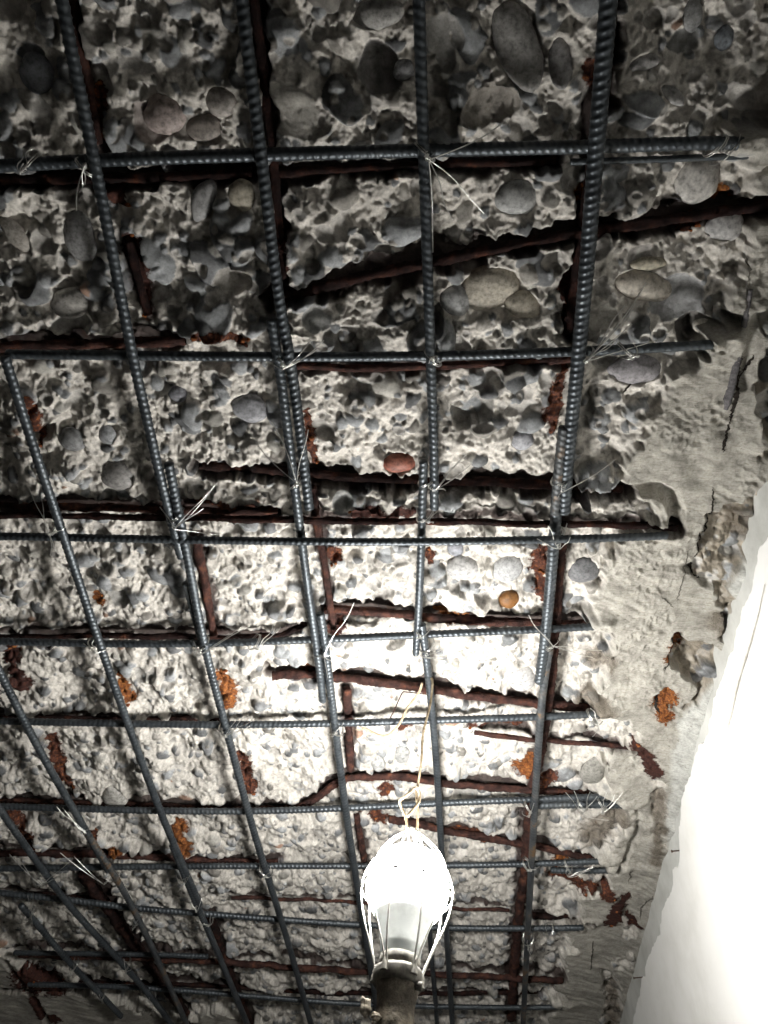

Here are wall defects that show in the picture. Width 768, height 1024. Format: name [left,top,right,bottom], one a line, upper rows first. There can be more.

spalling [0,0,254,159]
spalling [249,0,599,147]
spalling [598,0,768,224]
corrosion [296,357,571,434]
spalling [553,213,768,706]
crack [722,355,754,453]
spalling [0,154,645,1024]
corrosion [0,408,683,1024]
peeling [596,489,768,1024]